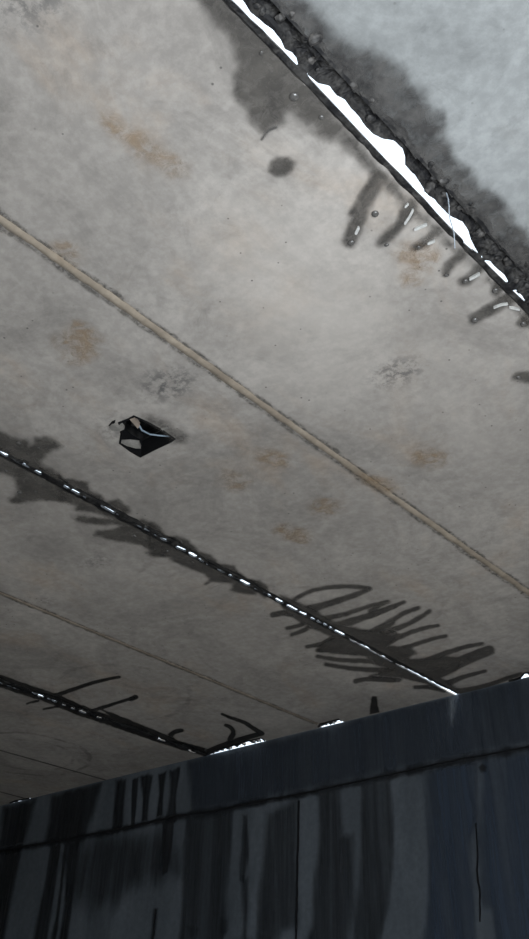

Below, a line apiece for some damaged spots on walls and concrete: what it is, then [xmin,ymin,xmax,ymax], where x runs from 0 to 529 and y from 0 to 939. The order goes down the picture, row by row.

damp [200,0,441,250]
damp [275,0,529,277]
damp [460,264,483,285]
damp [470,283,529,327]
damp [513,372,529,382]
hole [109,415,184,458]
damp [0,432,268,597]
spalling [206,738,265,755]
damp [0,585,529,939]